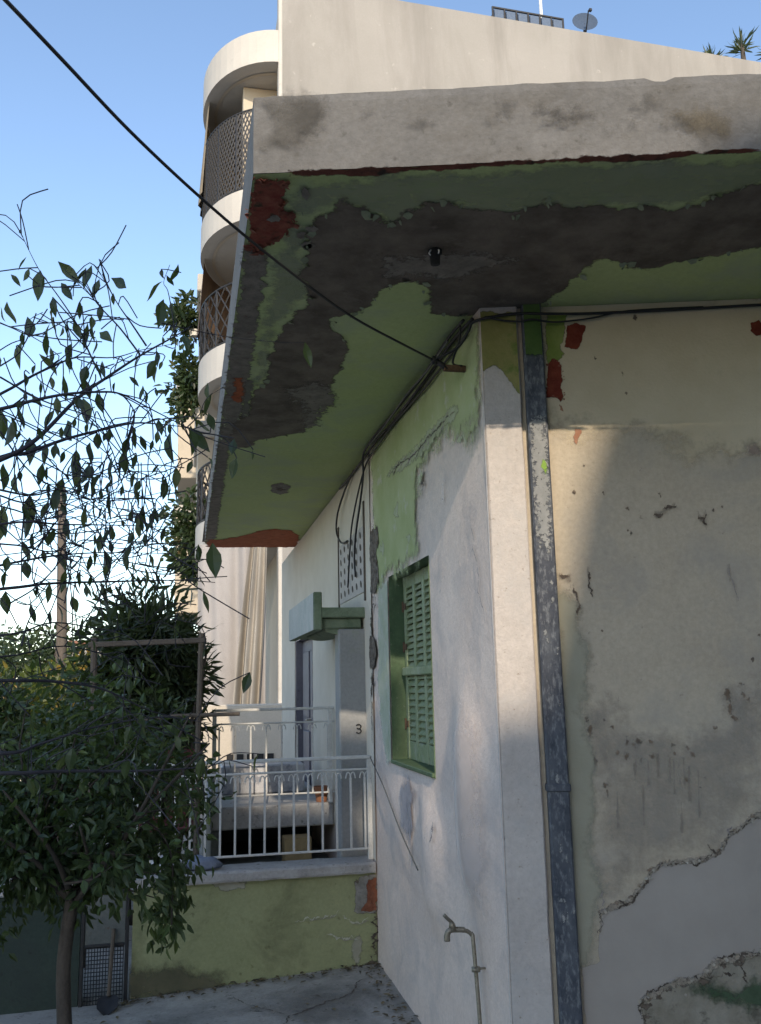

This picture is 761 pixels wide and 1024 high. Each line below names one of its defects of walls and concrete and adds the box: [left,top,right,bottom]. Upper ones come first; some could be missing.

peeling [751,320,761,336]
spalling [204,177,319,543]
corrosion [205,529,300,548]
peeling [369,304,586,764]
spalling [354,874,378,914]